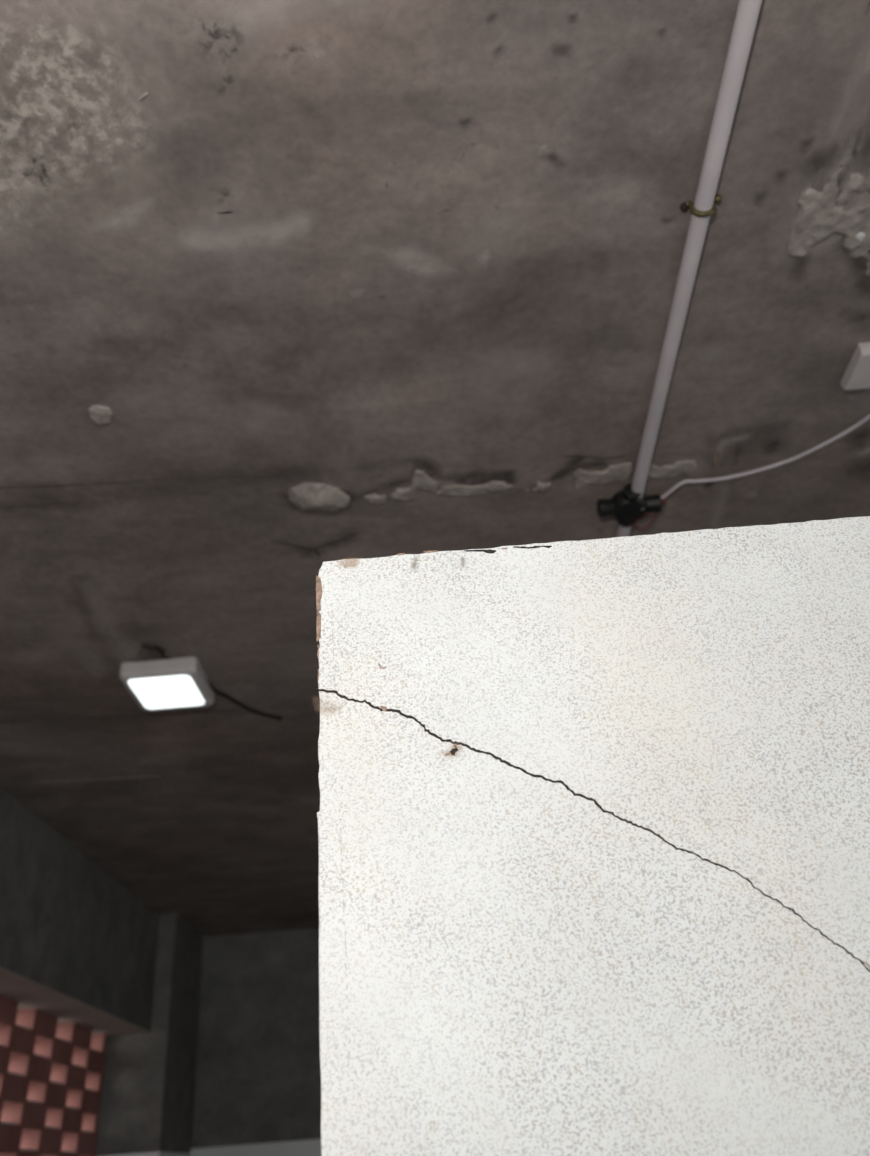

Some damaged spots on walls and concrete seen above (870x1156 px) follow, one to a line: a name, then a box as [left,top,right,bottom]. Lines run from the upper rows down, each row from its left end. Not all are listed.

spalling [787,163,870,277]
flaking render [364,462,514,505]
flaking render [526,457,633,493]
flaking render [647,460,697,480]
crack [0,710,236,723]
crack [314,689,870,972]